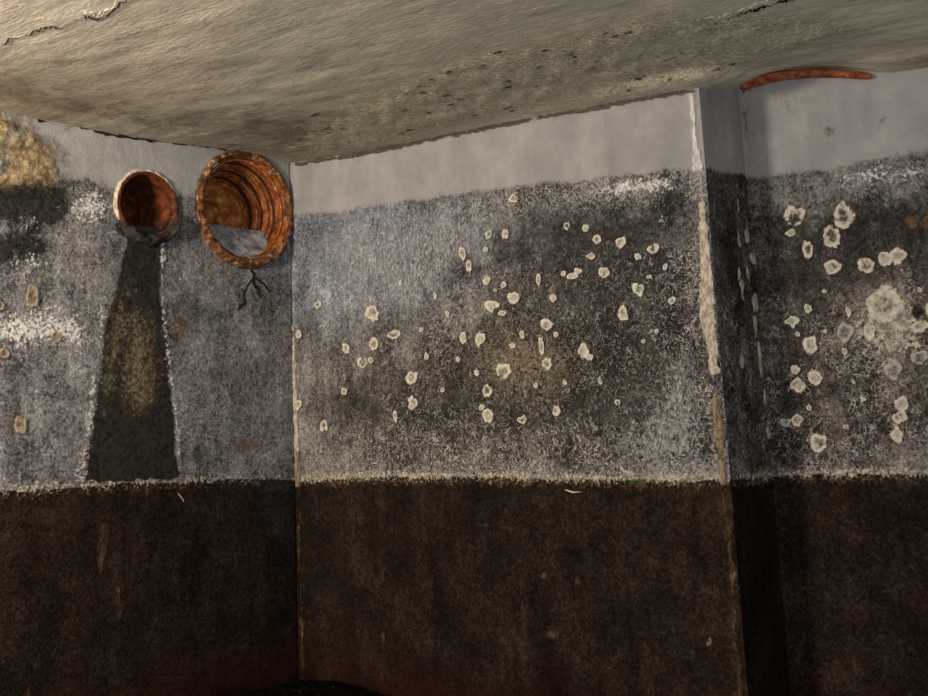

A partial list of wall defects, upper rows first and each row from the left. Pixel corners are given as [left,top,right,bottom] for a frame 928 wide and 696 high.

crack [0,0,127,45]
crack [693,0,791,27]
corrosion [740,68,872,93]
flaking render [0,110,73,205]
crack [238,269,271,310]
leakage [0,93,928,499]